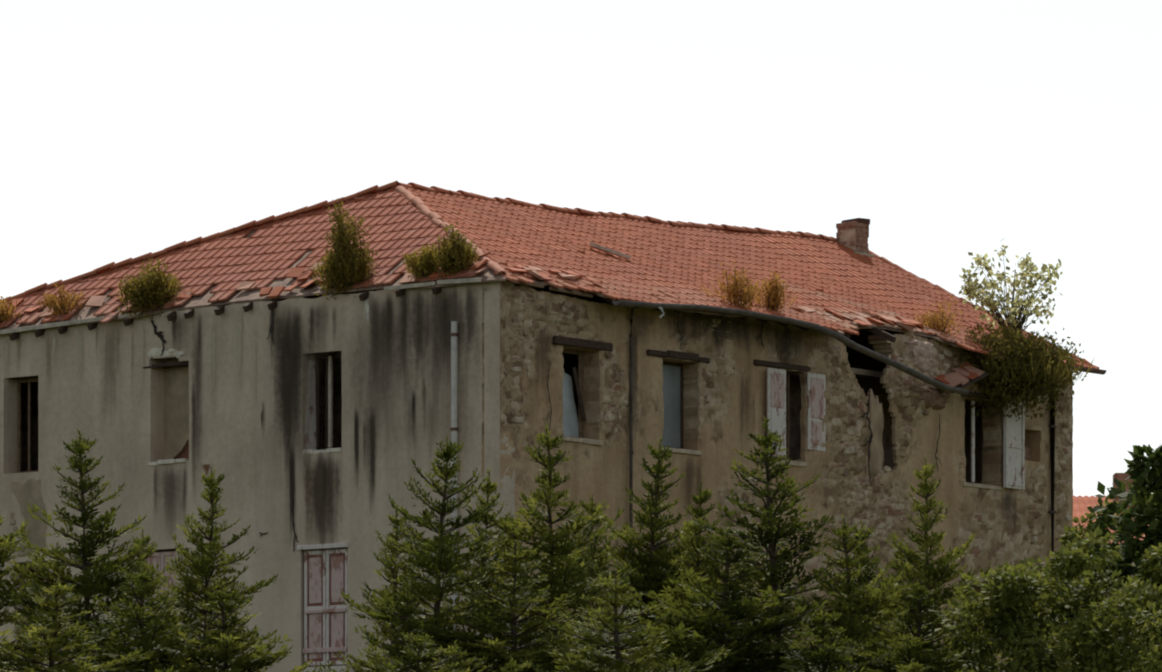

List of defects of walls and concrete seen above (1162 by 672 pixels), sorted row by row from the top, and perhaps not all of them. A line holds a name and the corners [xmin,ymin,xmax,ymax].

damp [154,471,186,508]
damp [192,323,215,454]
damp [271,310,337,522]
damp [354,413,375,484]
flaking render [504,285,592,430]
flaking render [823,341,917,585]
flaking render [906,339,934,372]
flaking render [1025,395,1072,571]